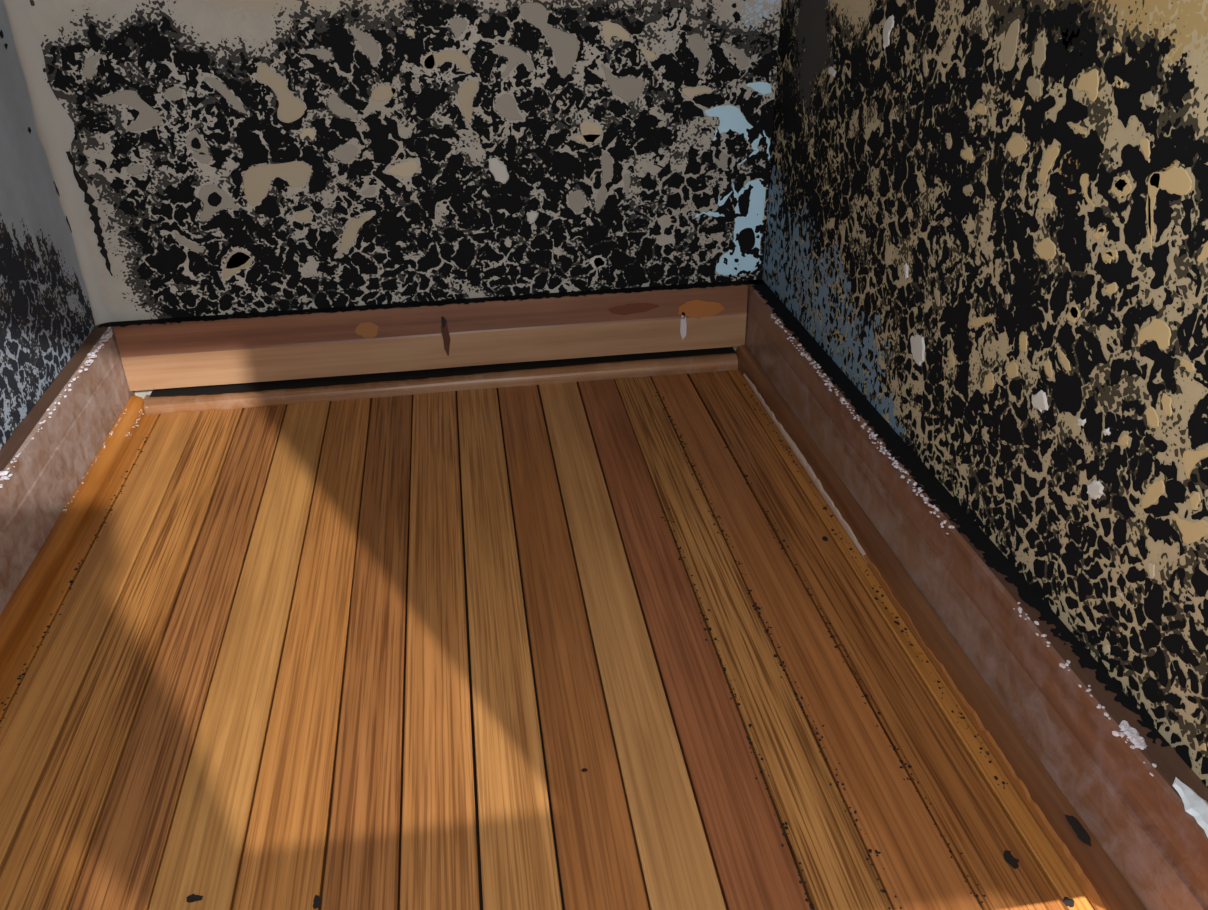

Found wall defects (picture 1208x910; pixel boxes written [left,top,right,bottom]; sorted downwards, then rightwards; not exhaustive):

flaking render [682,33,712,99]
flaking render [726,44,749,68]
peeling [746,82,771,95]
water stain [208,192,222,207]
peeling [692,105,770,275]
water stain [1137,240,1170,289]
water stain [0,214,96,448]
water stain [1159,393,1208,464]
water stain [0,453,20,488]
water stain [1184,499,1208,520]
water stain [1173,745,1193,769]
water stain [1065,815,1091,846]